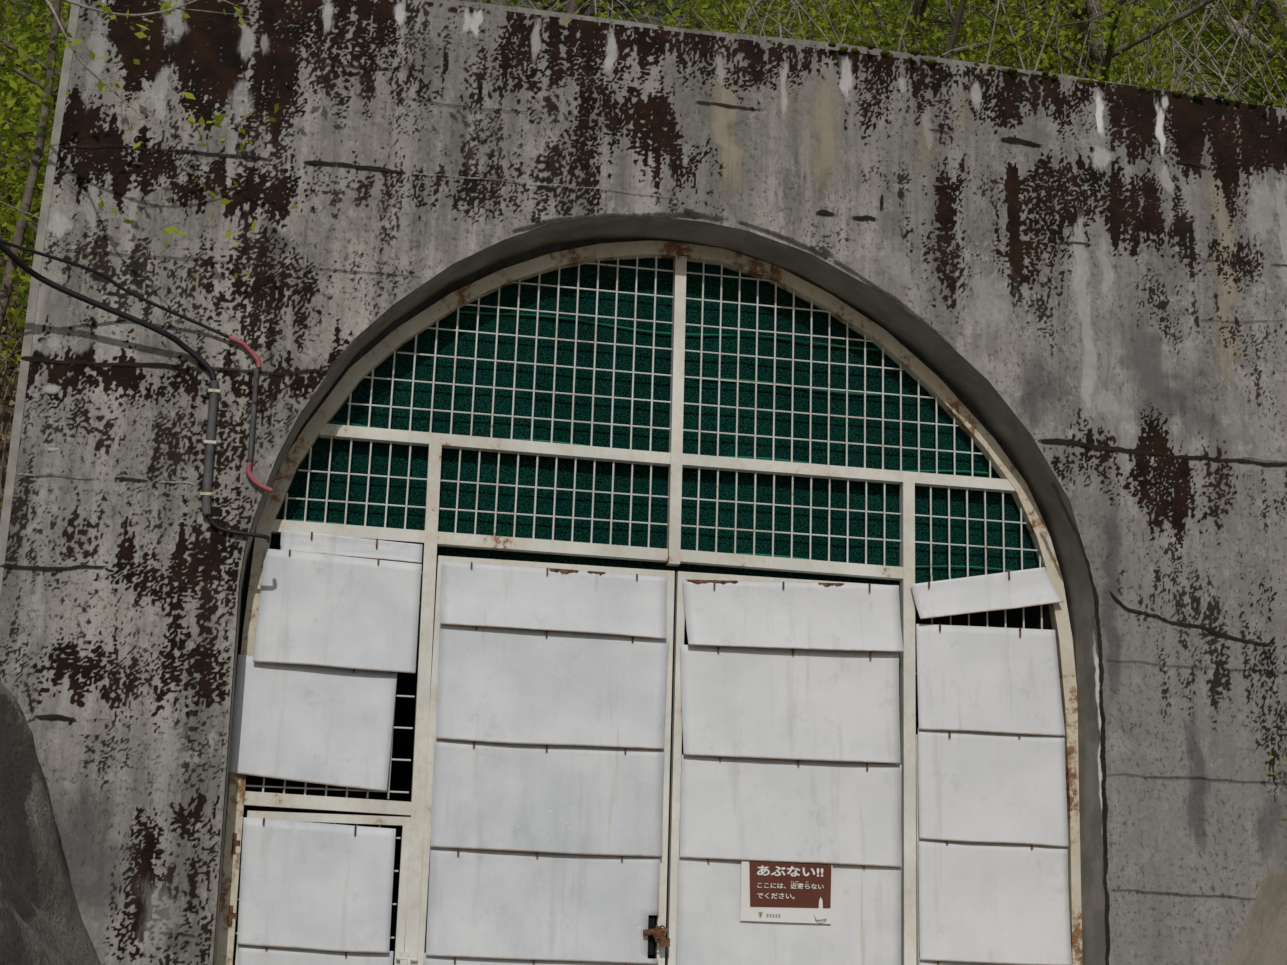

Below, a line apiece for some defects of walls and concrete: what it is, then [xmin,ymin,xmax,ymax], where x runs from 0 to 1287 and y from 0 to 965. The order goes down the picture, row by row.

leakage [233,103,314,184]
leakage [1075,91,1110,169]
leakage [1155,96,1168,156]
leakage [221,207,287,286]
leakage [899,197,1074,359]
leakage [1205,178,1241,374]
crack [1040,438,1287,467]
leakage [80,577,236,792]
leakage [1094,650,1103,808]
crack [1051,483,1287,965]
leakage [1236,554,1287,799]
leakage [174,830,219,965]